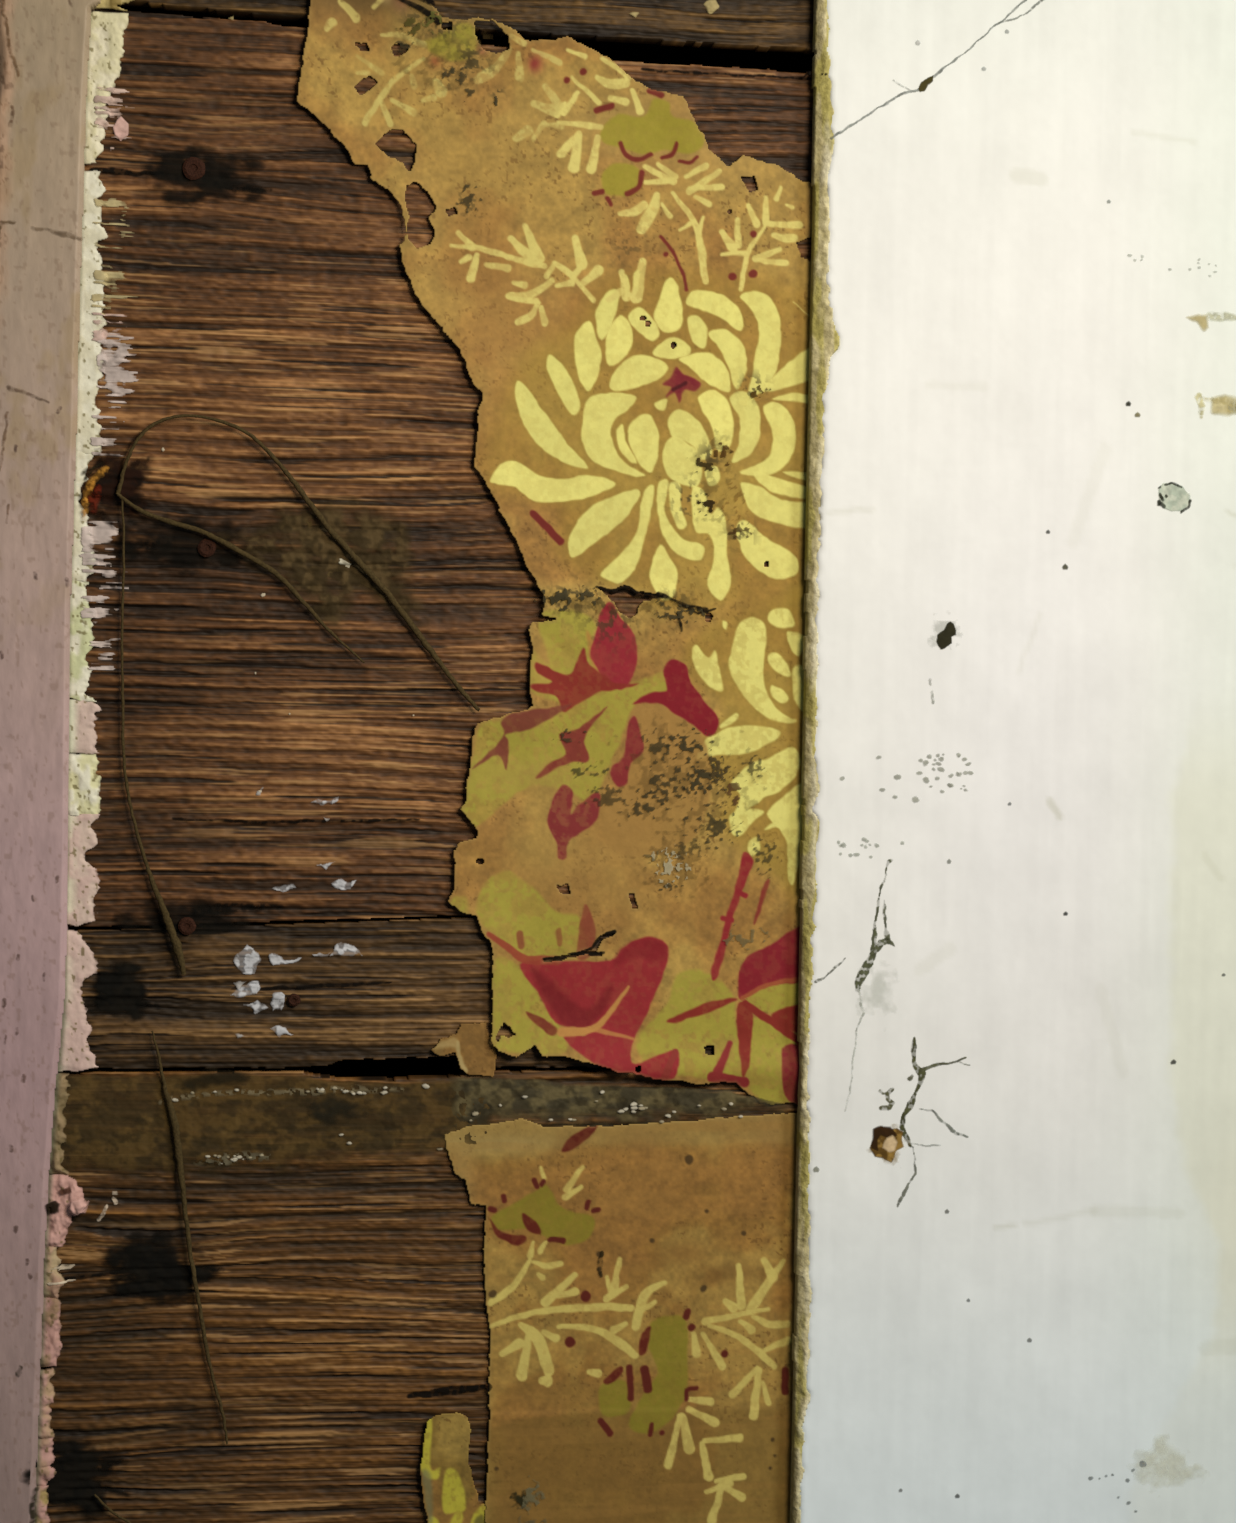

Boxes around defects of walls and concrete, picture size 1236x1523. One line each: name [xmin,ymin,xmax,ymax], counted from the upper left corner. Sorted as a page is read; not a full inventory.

crack [830,0,1043,139]
corrosion [146,147,265,204]
peeling [1158,482,1192,513]
peeling [937,621,956,649]
peeling [16,0,134,1523]
crack [815,859,895,1023]
crack [879,1037,968,1207]